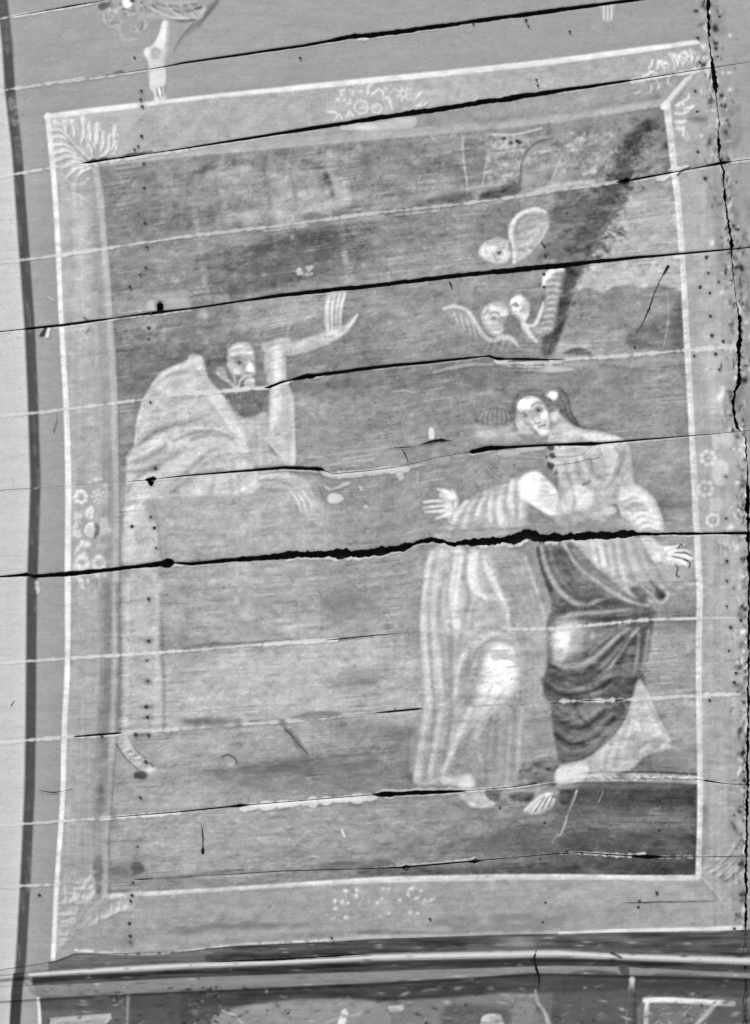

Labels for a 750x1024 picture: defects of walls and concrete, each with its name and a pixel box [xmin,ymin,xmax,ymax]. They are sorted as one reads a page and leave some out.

crack [0,0,640,94]
crack [0,67,712,180]
crack [0,162,721,265]
crack [0,249,731,334]
crack [0,343,737,419]
crack [117,432,730,485]
crack [706,0,750,930]
crack [0,529,747,579]
crack [0,778,577,854]
crack [692,777,732,786]
crack [533,951,541,988]